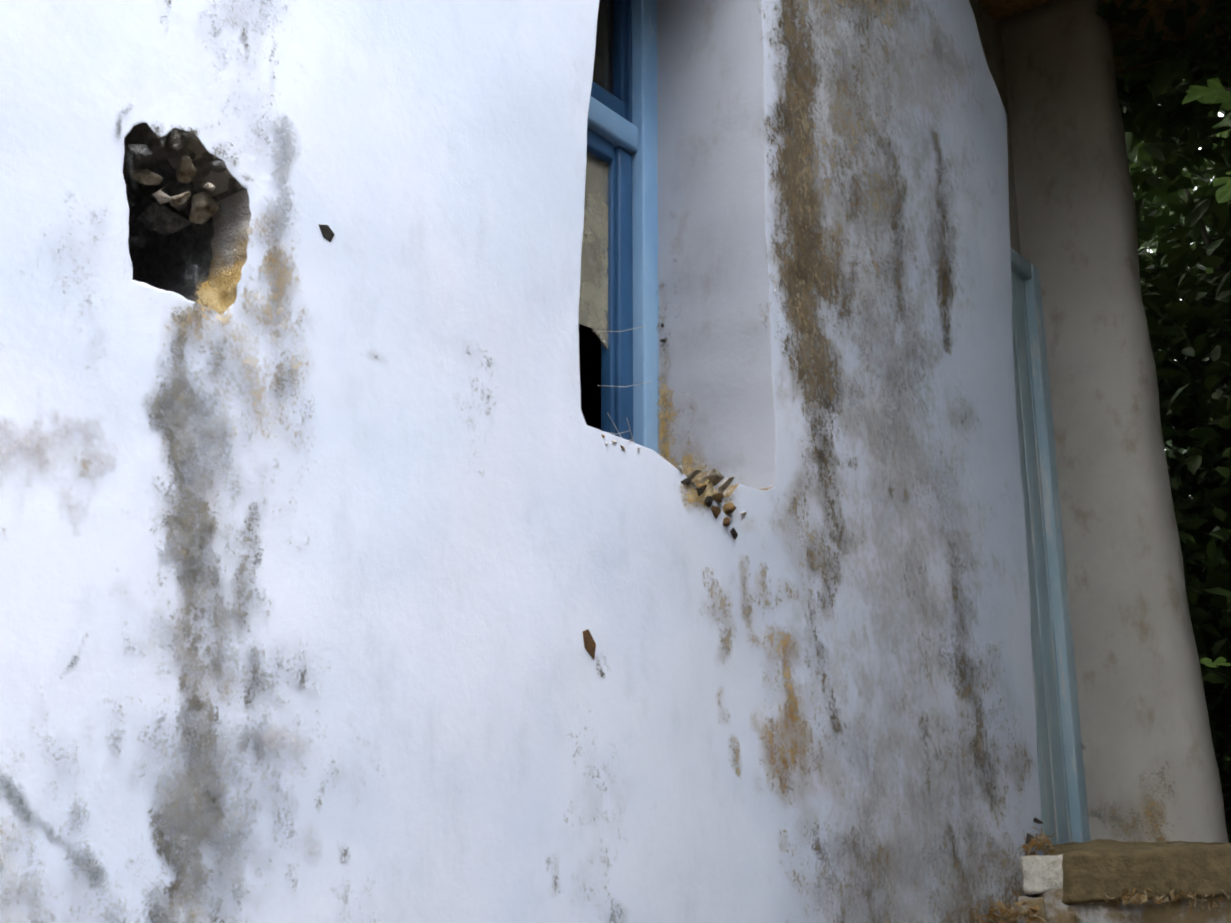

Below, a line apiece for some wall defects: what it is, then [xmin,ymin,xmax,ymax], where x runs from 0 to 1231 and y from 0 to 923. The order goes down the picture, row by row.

spalling [123,123,253,235]
flaking render [196,263,241,325]
damp [145,95,311,923]
flaking render [658,309,733,508]
damp [703,0,949,776]
damp [932,133,954,354]
damp [918,535,1032,923]
damp [794,820,899,923]